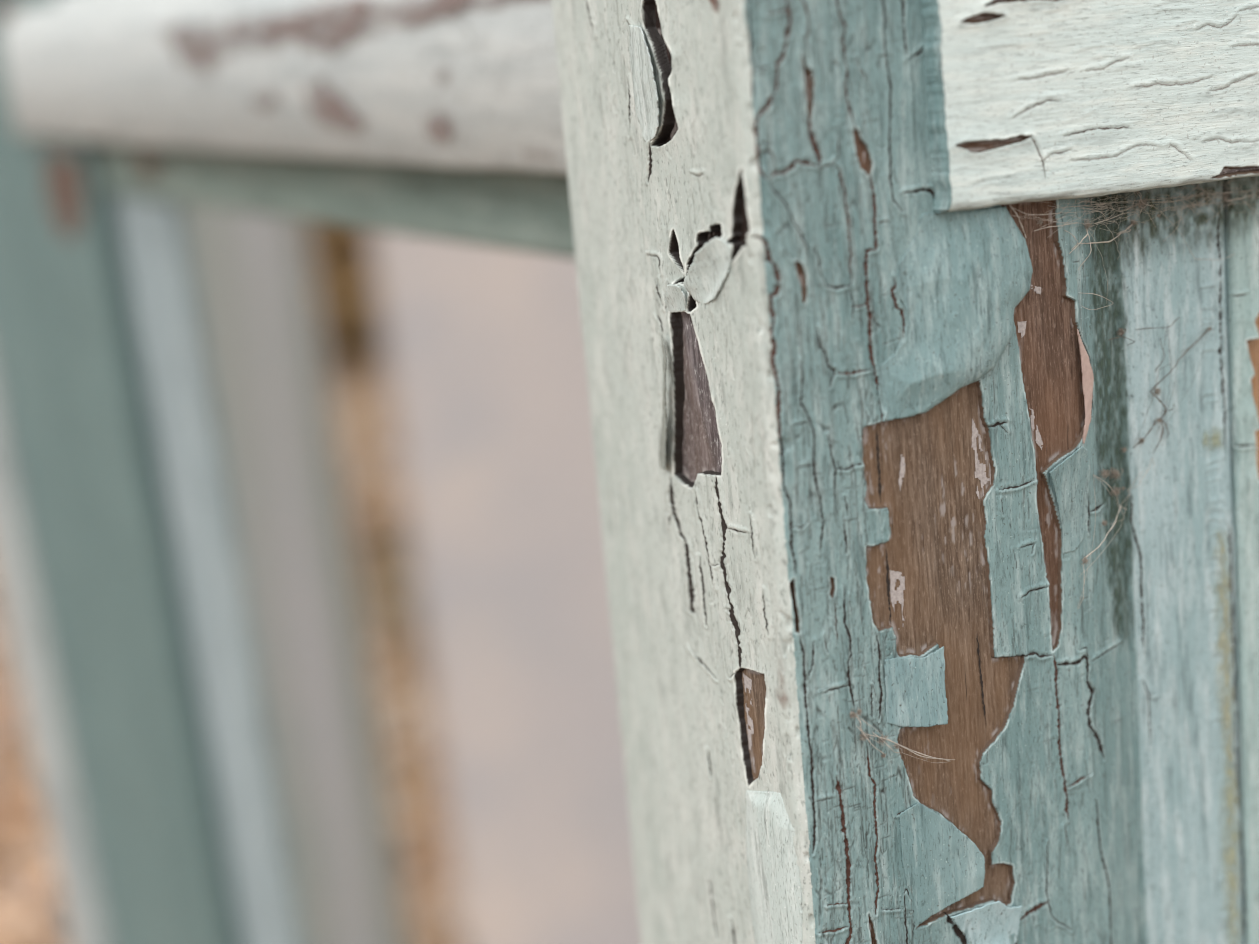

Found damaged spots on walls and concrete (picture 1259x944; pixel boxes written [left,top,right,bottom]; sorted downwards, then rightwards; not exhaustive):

peeling [629,3,678,144]
crack [1014,7,1259,173]
peeling [665,195,750,482]
crack [748,0,934,574]
peeling [1001,200,1094,647]
peeling [1246,314,1259,477]
crack [669,478,768,678]
peeling [742,669,766,780]
crack [800,550,967,944]
peeling [862,382,1023,944]
crack [977,636,986,720]
crack [1015,496,1145,944]